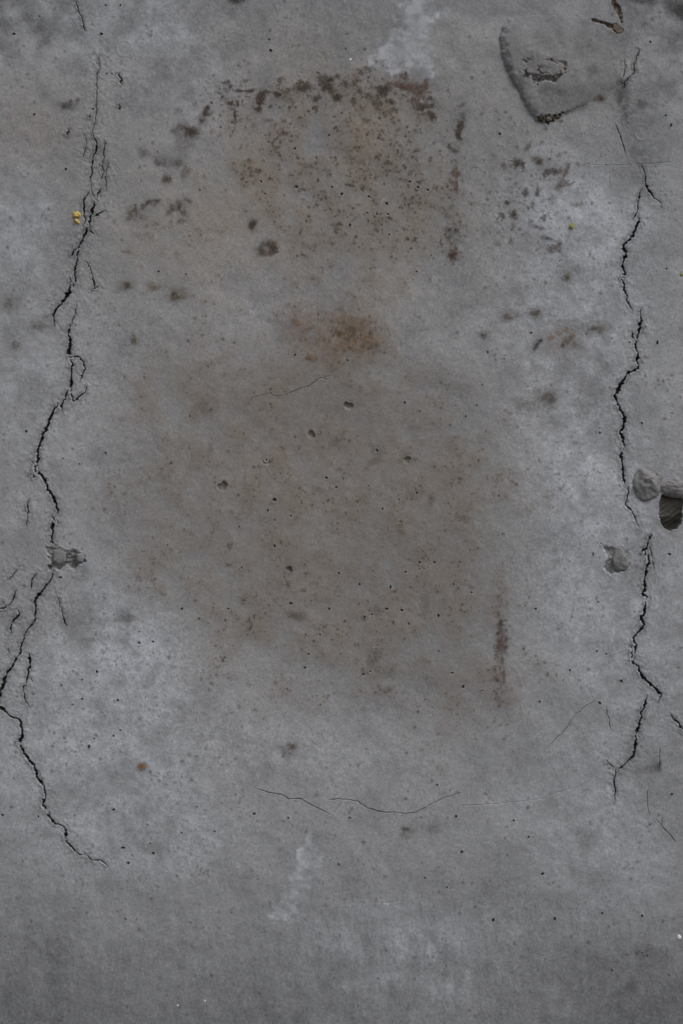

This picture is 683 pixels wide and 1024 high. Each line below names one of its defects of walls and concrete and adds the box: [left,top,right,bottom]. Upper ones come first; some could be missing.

crack [73,0,88,33]
spalling [517,55,571,88]
rust [173,67,463,158]
spalling [535,110,568,127]
crack [0,55,124,867]
crack [547,48,683,843]
spalling [40,538,89,573]